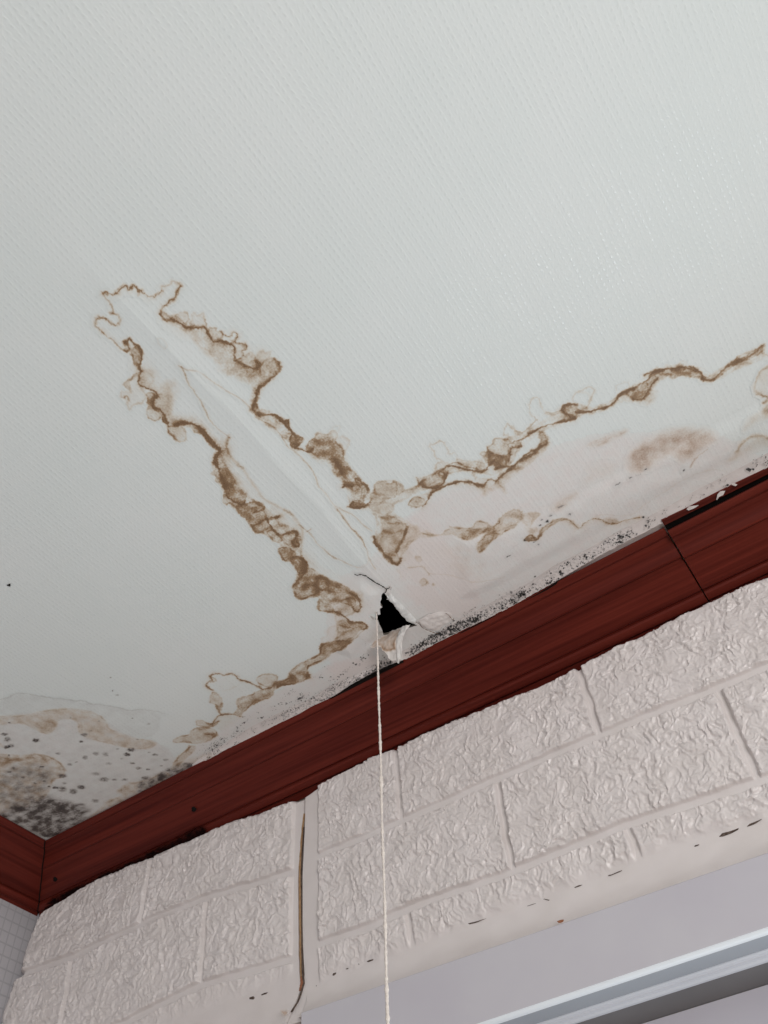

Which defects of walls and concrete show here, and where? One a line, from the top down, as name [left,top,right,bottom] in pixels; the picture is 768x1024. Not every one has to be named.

damp [0,277,768,840]